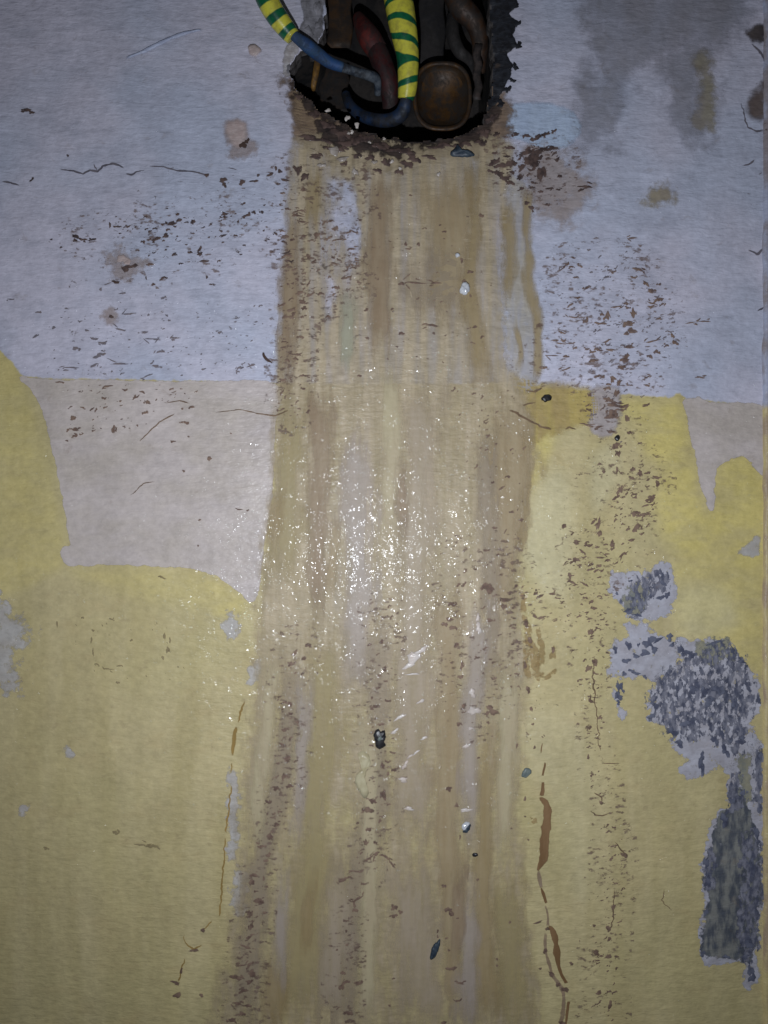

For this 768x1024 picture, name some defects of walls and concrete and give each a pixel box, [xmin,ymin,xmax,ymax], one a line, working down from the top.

flaking render [283,0,325,77]
peeling [497,62,519,108]
leakage [578,0,743,135]
leakage [746,25,764,42]
leakage [748,82,764,119]
peeling [20,376,280,602]
peeling [588,386,620,441]
peeling [682,396,763,511]
leakage [47,88,710,1024]
corrosion [531,744,552,871]
flaking render [606,561,764,991]
corrosion [533,920,573,1024]